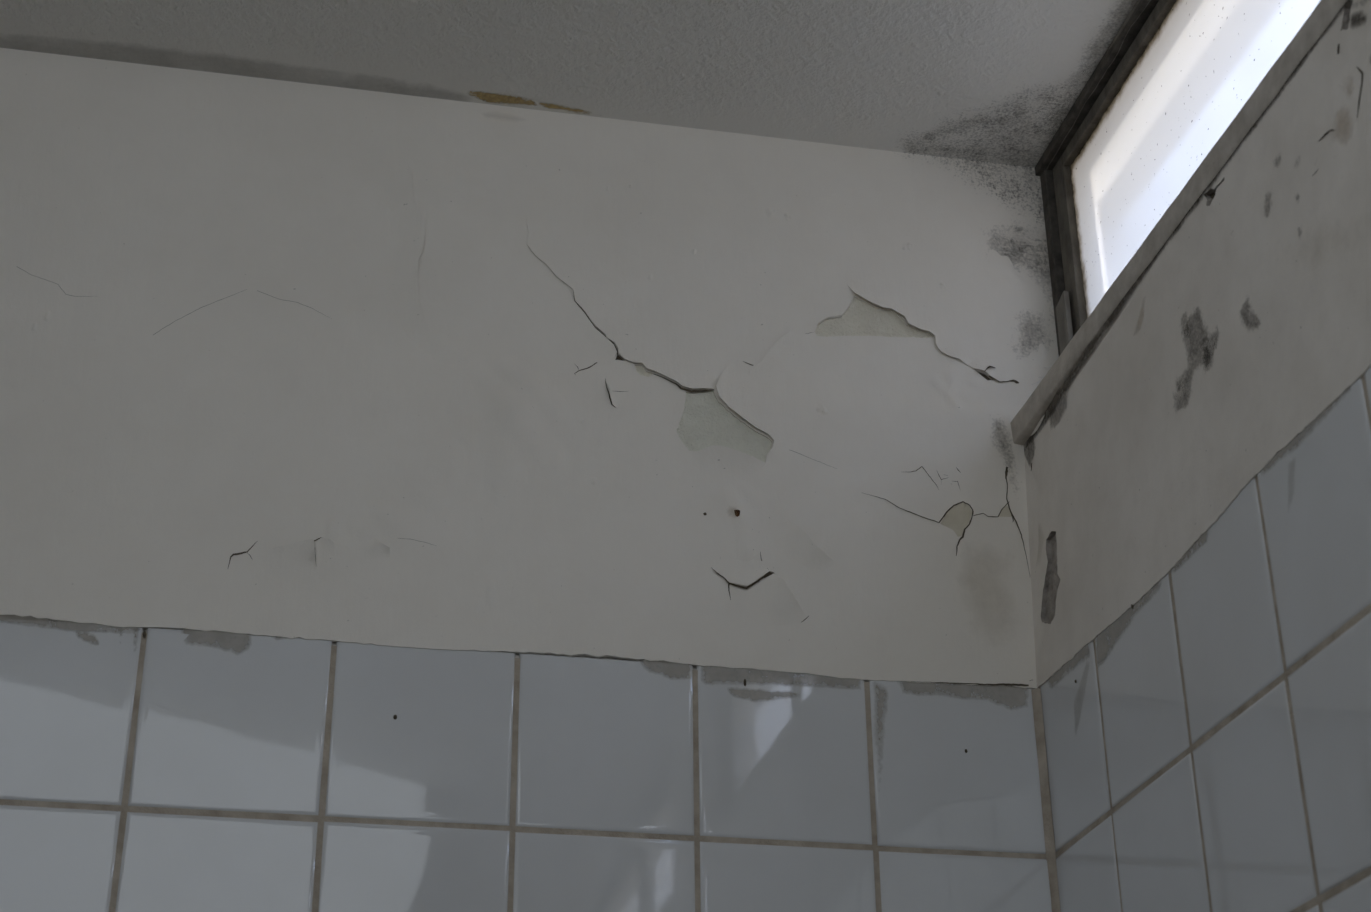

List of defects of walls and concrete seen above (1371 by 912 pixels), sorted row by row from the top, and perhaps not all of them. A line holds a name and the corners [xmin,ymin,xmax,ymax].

peeling [527,192,1019,481]
crack [864,463,1032,574]
peeling [713,552,809,627]
flaking render [1045,534,1060,623]